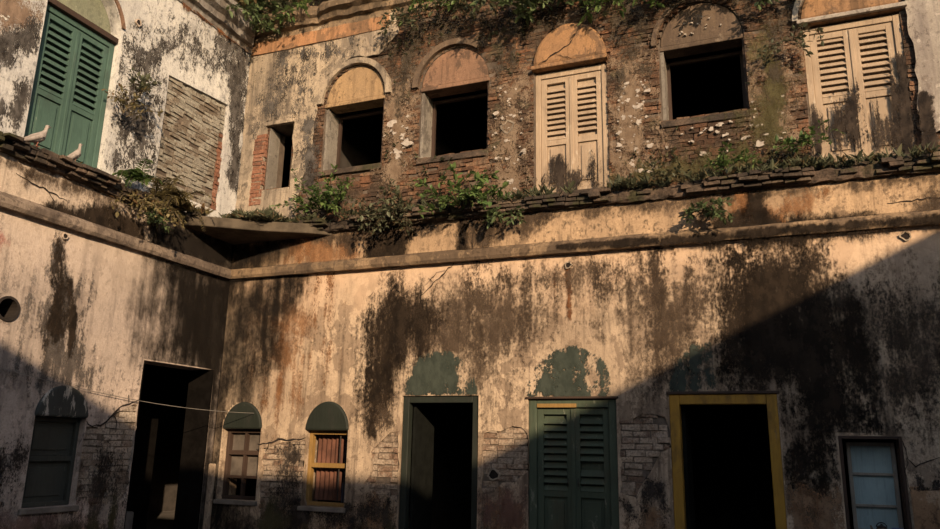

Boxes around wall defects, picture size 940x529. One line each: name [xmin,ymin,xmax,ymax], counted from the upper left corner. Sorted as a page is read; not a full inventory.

peeling [0,0,45,41]
damp [106,13,361,194]
damp [810,50,939,158]
damp [536,146,605,192]
damp [312,211,562,258]
damp [5,230,104,399]
damp [350,172,940,529]
spalling [75,402,138,507]
crack [86,395,139,432]
spalling [365,431,399,503]
spalling [482,426,528,494]
spalling [619,414,671,497]